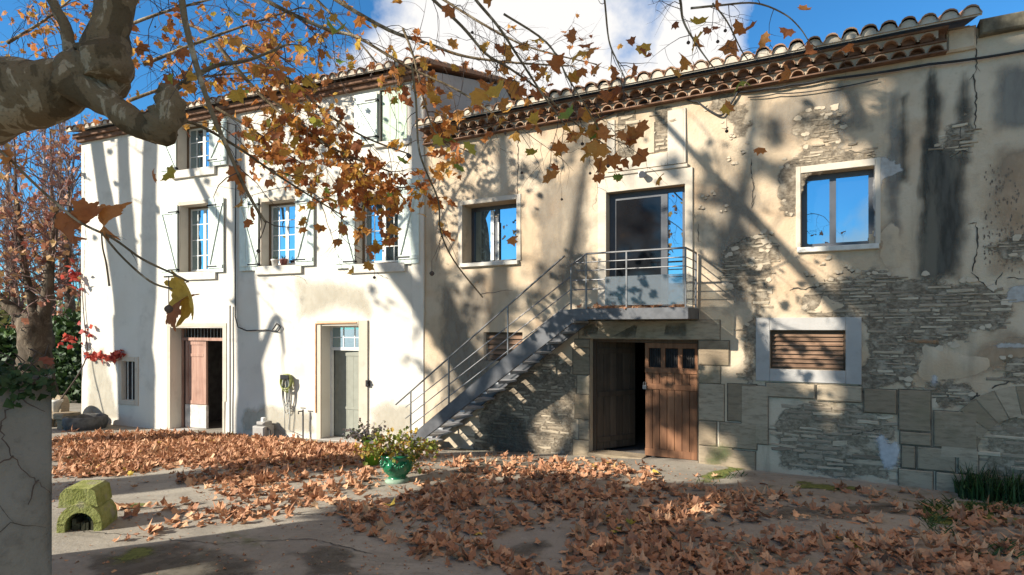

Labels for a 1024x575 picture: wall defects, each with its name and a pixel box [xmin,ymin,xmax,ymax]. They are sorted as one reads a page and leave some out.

flaking render [777,103,878,217]
water stain [920,82,971,279]
flaking render [718,229,786,384]
flaking render [799,255,1024,408]